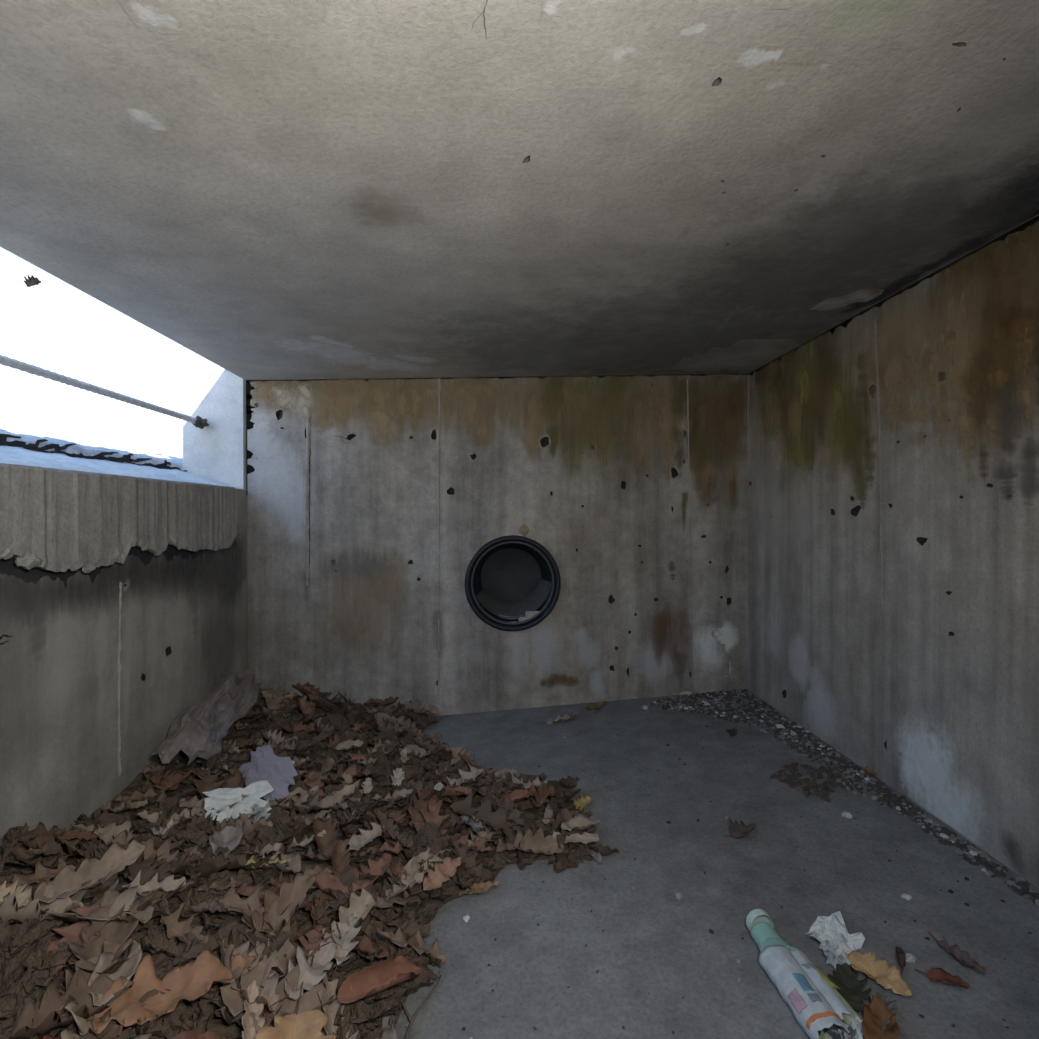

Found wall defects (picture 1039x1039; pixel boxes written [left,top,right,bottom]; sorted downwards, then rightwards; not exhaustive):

water stain [734,45,790,92]
water stain [253,170,1039,505]
water stain [247,425,333,547]
peeling [1,548,43,570]
peeling [61,563,104,573]
water stain [502,611,614,702]
water stain [629,617,740,698]